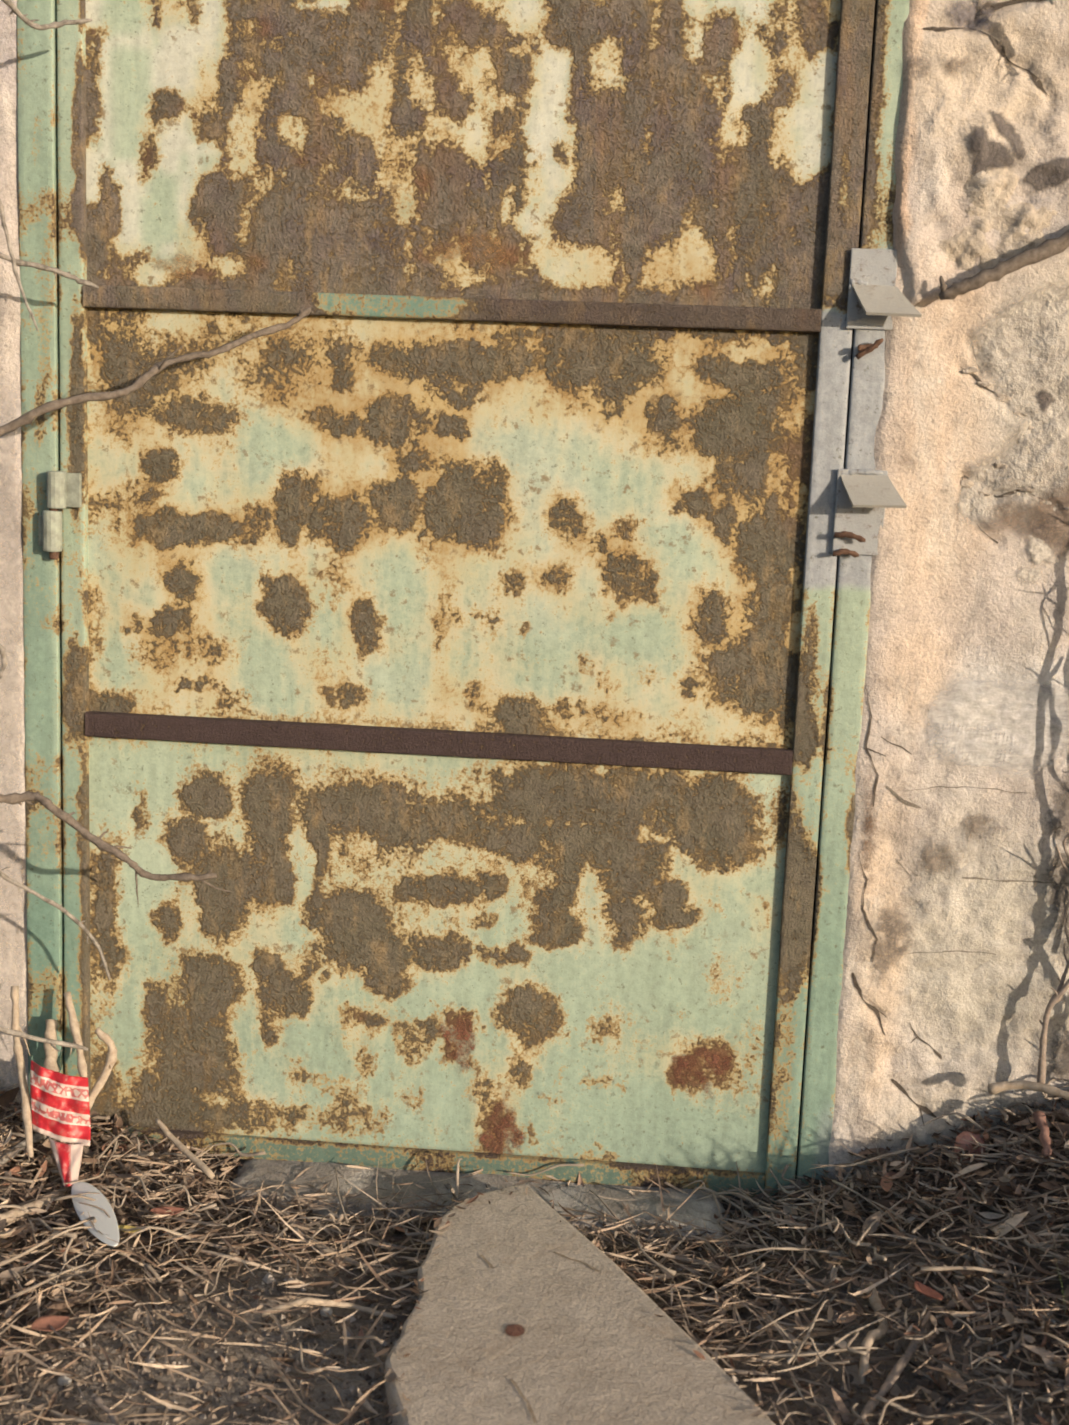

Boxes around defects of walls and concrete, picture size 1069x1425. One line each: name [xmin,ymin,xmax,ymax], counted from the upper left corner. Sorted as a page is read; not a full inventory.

crack [923,0,1049,96]
crack [851,854,996,1059]
corrosion [441,1018,475,1068]
corrosion [672,1046,732,1092]
crack [891,1079,937,1126]
corrosion [479,1103,525,1154]